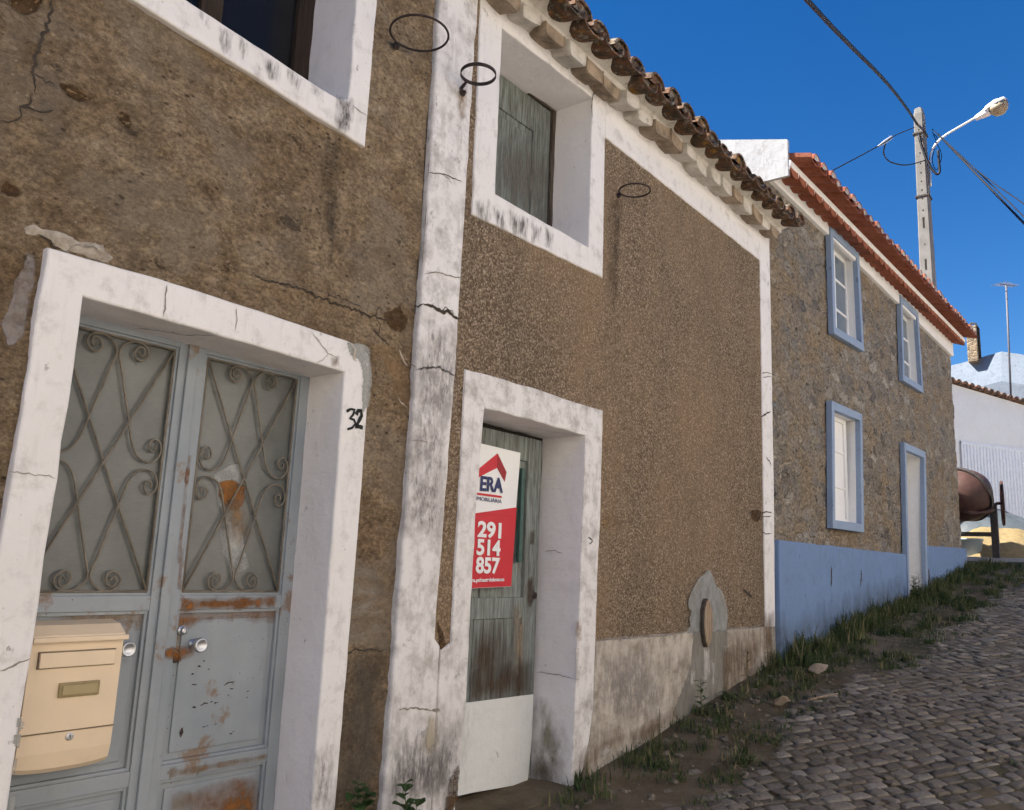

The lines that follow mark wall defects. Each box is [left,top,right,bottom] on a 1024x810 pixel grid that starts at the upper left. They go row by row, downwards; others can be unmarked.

crack [2,0,55,123]
peeling [24,224,113,262]
water stain [478,208,551,241]
peeling [2,255,34,345]
crack [252,272,462,376]
peeling [347,343,407,412]
rust [219,480,245,531]
rust [178,598,274,625]
rust [165,648,191,658]
spalling [437,622,446,649]
crack [399,705,440,713]
rust [198,781,255,810]